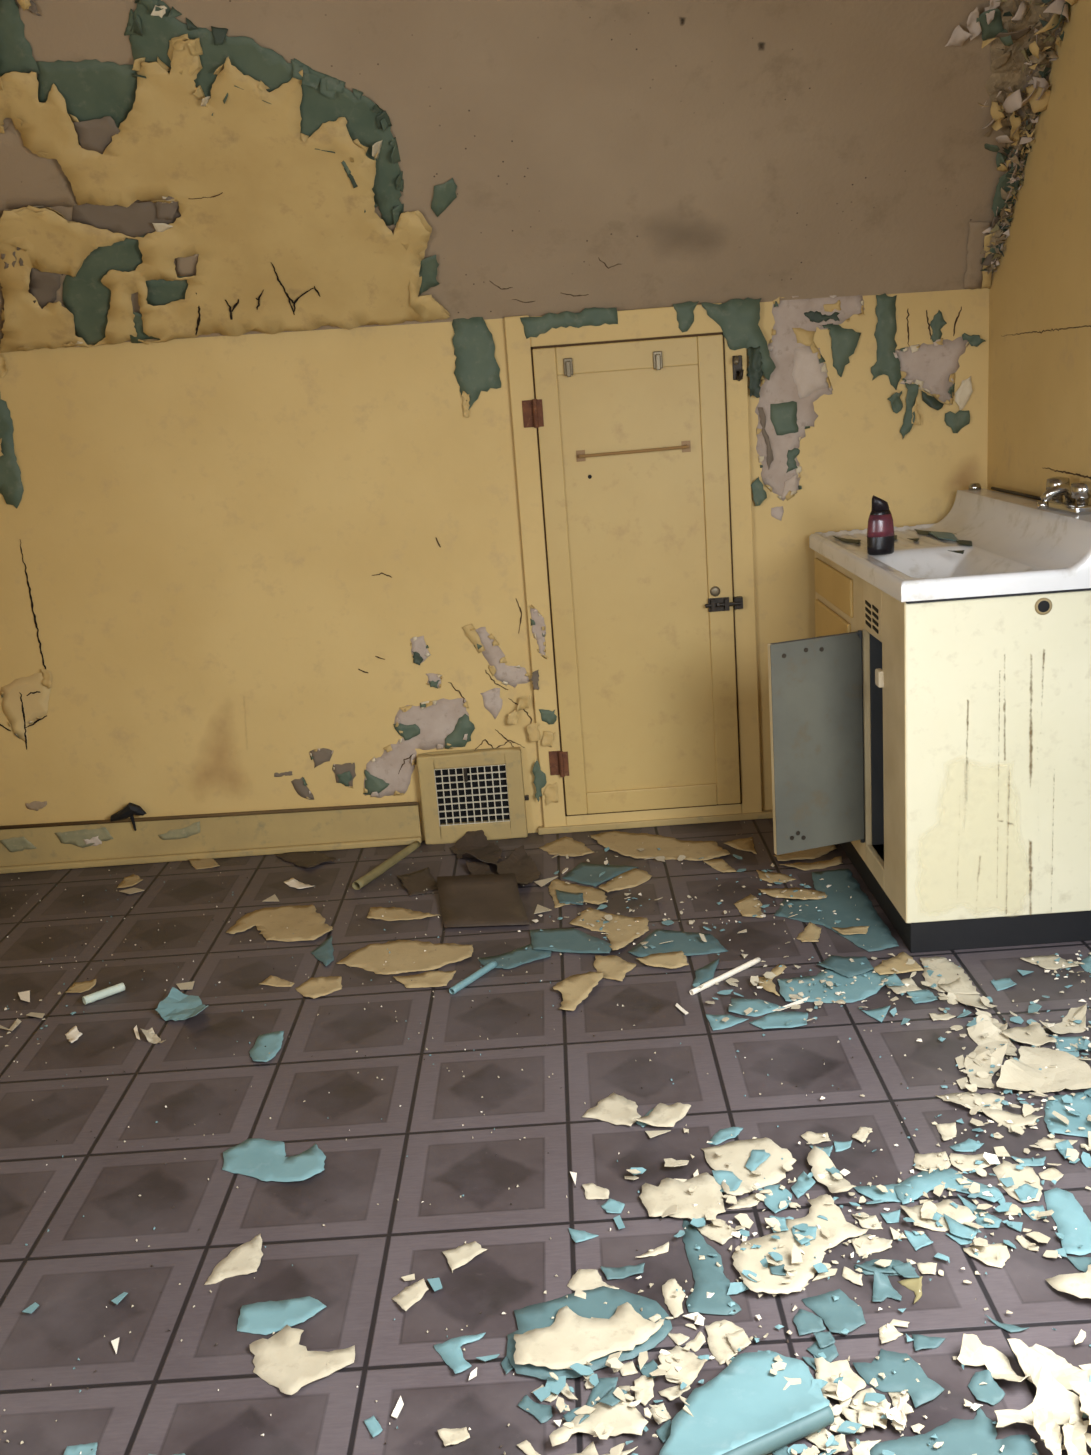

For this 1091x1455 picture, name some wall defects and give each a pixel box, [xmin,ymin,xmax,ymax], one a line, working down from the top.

peeling [0,0,501,418]
peeling [945,0,1078,290]
peeling [0,396,24,509]
flaking render [673,293,986,521]
crack [0,540,47,749]
flaking render [274,604,558,806]